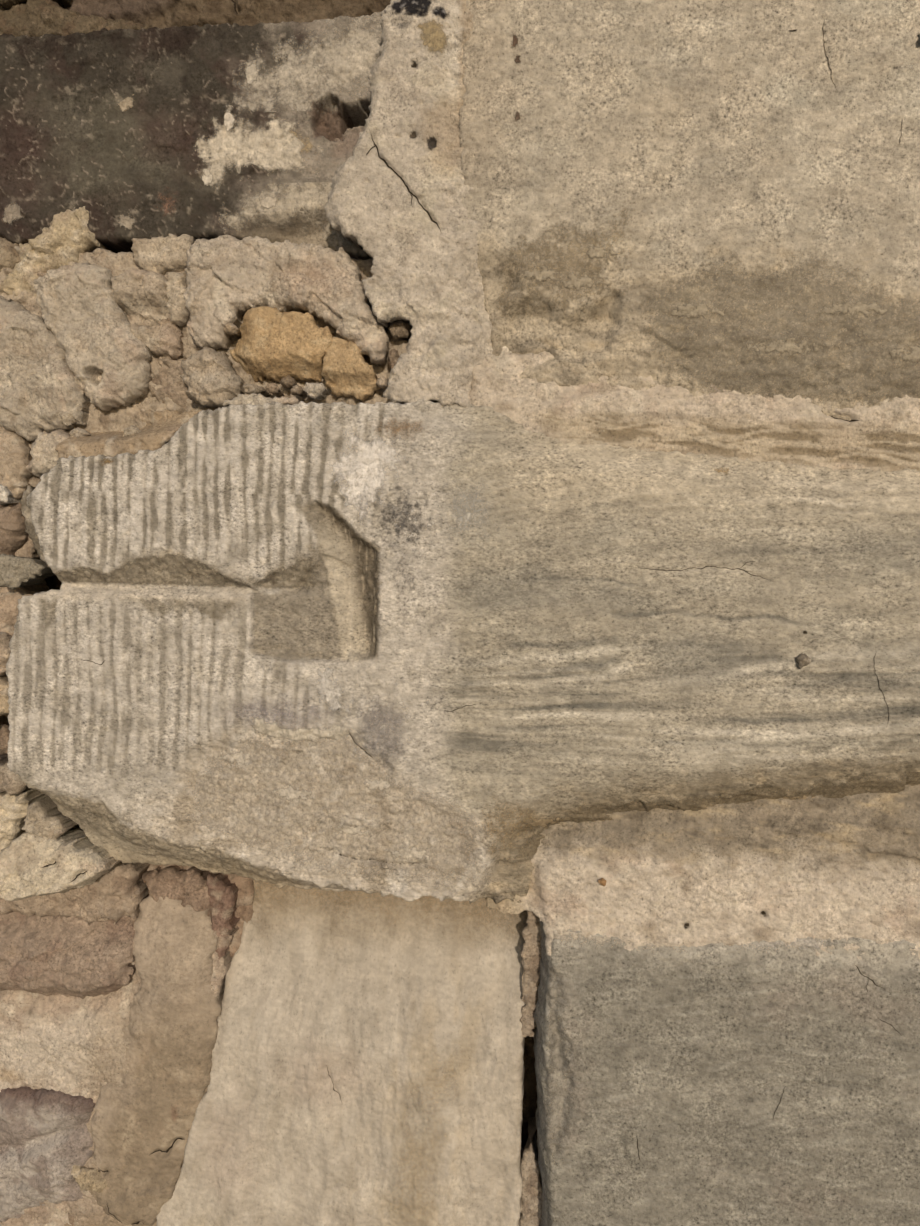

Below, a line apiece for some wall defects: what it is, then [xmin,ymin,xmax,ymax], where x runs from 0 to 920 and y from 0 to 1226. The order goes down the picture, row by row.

crack [366,134,441,231]